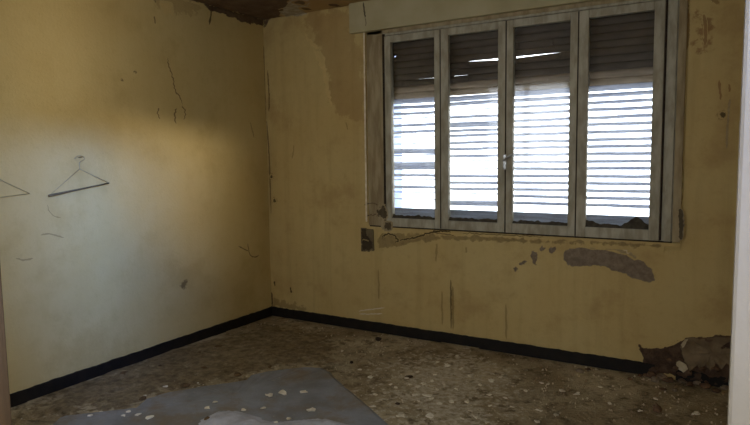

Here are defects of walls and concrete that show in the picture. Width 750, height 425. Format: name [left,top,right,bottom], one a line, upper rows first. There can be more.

flaking render [183,0,314,28]
crack [157,58,187,123]
leakage [296,5,368,132]
flaking render [361,228,374,252]
flaking render [512,245,658,284]
flaking render [637,332,731,385]